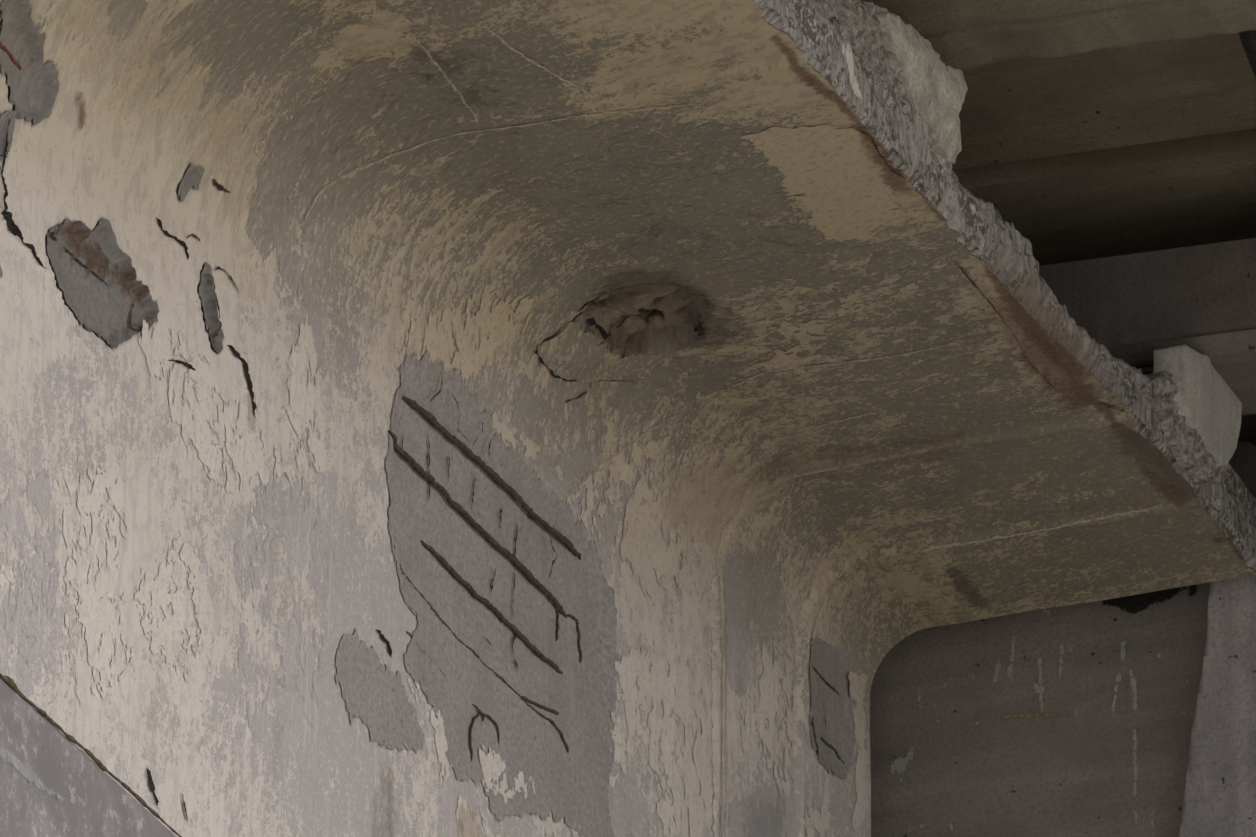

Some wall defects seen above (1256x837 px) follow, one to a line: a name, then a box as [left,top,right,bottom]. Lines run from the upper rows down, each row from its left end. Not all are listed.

crack [0,119,45,268]
spalling [0,0,59,160]
peeling [740,95,931,242]
corrosion [772,37,951,229]
spalling [811,0,968,186]
crack [168,359,196,371]
spalling [45,218,327,504]
crack [228,345,256,419]
peeling [742,297,831,374]
spalling [1135,344,1242,485]
spalling [335,282,721,837]
spalling [736,637,869,837]